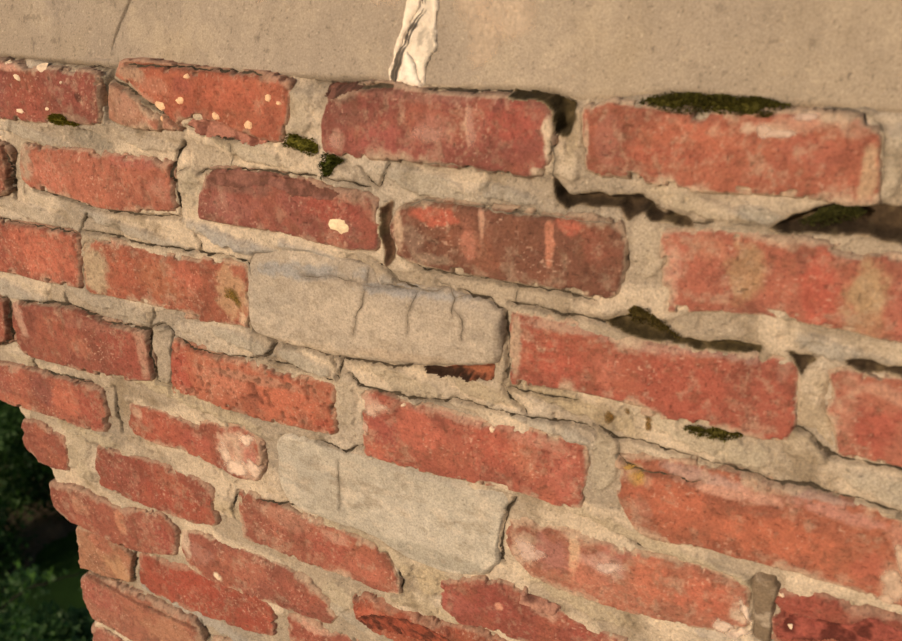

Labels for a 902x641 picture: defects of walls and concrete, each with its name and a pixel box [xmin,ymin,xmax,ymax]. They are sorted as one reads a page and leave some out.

crack [388,0,439,87]
crack [825,106,886,175]
crack [0,263,902,511]
spalling [358,614,451,641]
spalling [775,614,902,641]